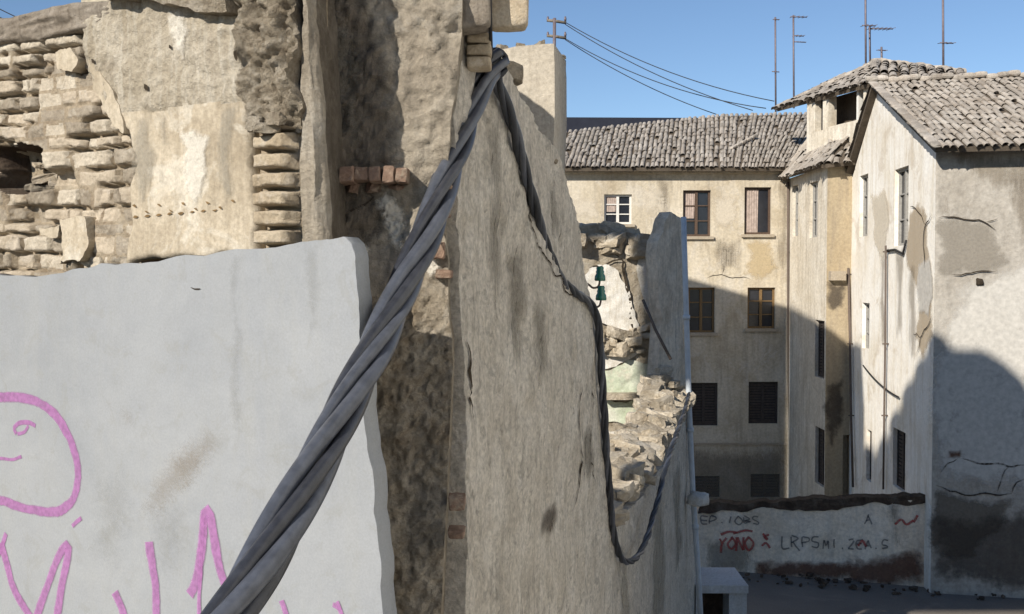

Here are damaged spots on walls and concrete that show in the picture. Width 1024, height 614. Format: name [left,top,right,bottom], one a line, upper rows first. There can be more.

flaking render [55,48,131,135]
spalling [127,0,306,134]
spalling [24,183,55,192]
flaking render [132,131,234,218]
flaking render [39,216,97,264]
flaking render [907,206,932,354]
peeling [605,353,648,434]
crack [936,459,1024,496]
damp [543,507,557,530]
damp [937,514,1024,585]